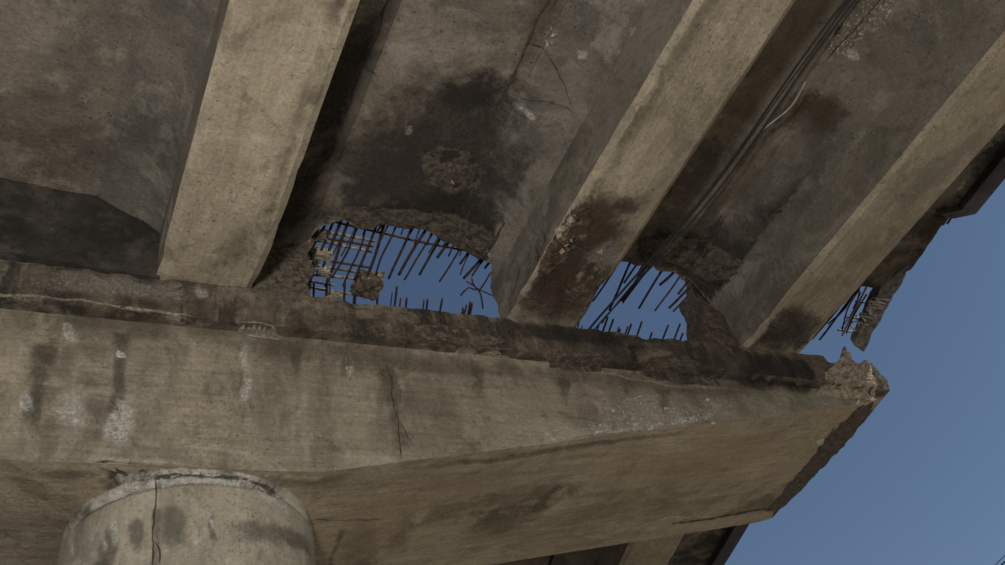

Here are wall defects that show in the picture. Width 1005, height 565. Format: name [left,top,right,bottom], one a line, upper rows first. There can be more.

crack [492,0,572,123]
spalling [820,0,897,66]
spalling [417,145,488,196]
spalling [308,195,505,308]
spalling [521,198,744,341]
crack [375,364,413,458]
spalling [768,286,891,517]
crack [152,481,161,565]
water stain [100,460,288,514]